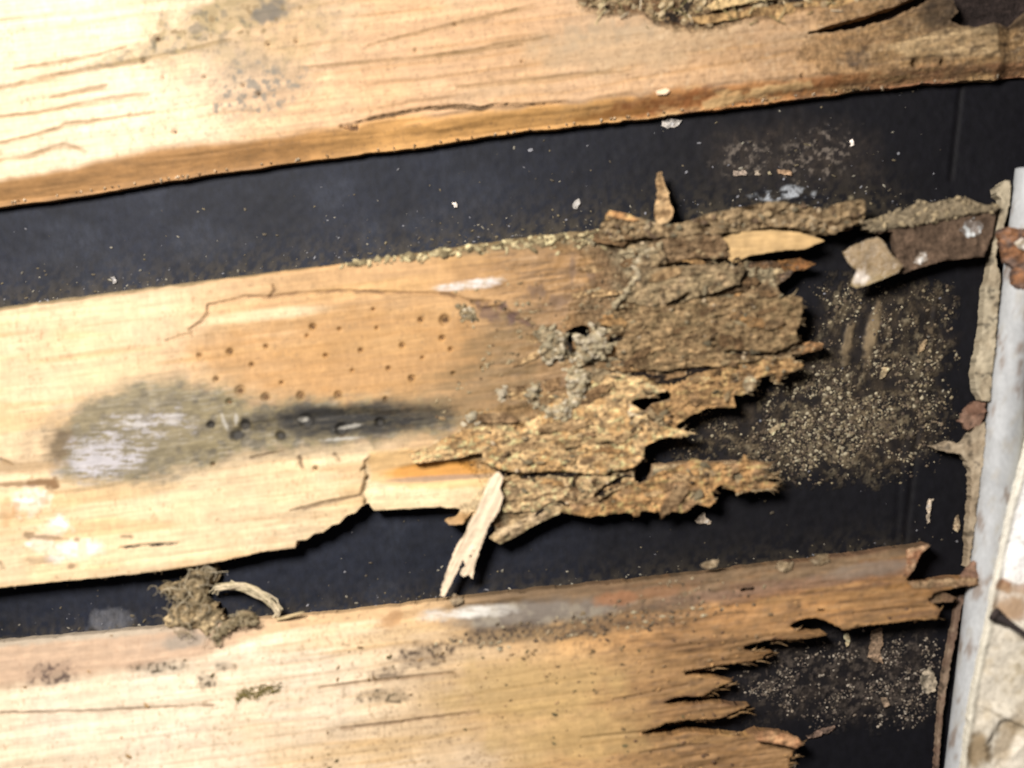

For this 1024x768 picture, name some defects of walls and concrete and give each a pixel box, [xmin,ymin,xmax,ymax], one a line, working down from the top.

crack [164,283,469,343]
peeling [365,199,866,544]
water stain [0,291,552,571]
peeling [700,559,719,569]
peeling [774,561,794,573]
peeling [810,554,830,565]
peeling [903,545,979,603]
peeling [754,730,804,748]